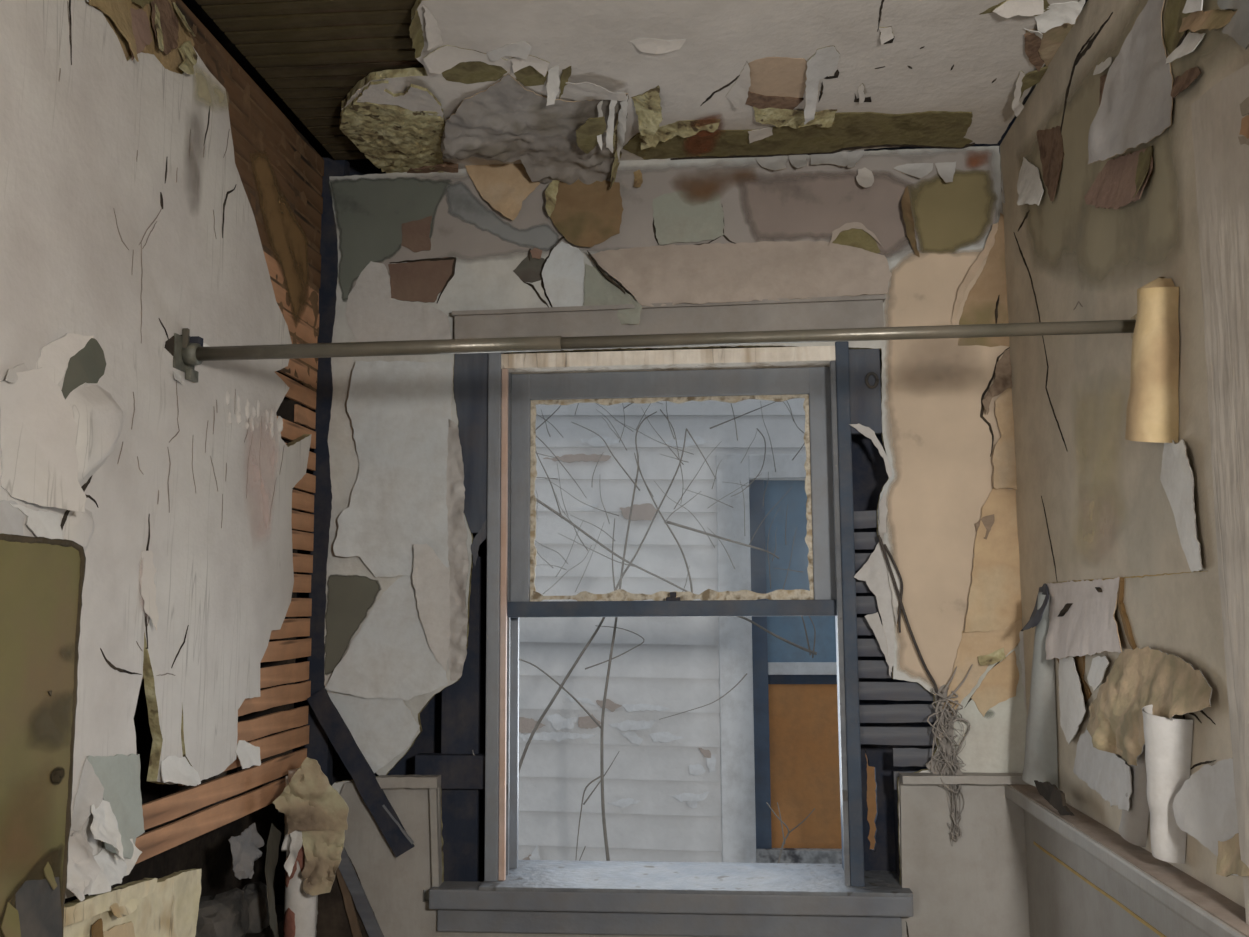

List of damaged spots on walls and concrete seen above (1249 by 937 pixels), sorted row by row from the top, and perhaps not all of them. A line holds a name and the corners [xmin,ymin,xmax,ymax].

crack [113,107,237,343]
crack [876,0,884,32]
peeling [1017,126,1064,205]
flaking render [1012,15,1079,117]
spalling [1238,97,1249,145]
peeling [0,363,86,539]
flaking render [85,0,993,887]
peeling [1160,439,1203,572]
flaking render [971,631,1027,726]
peeling [1073,646,1213,864]